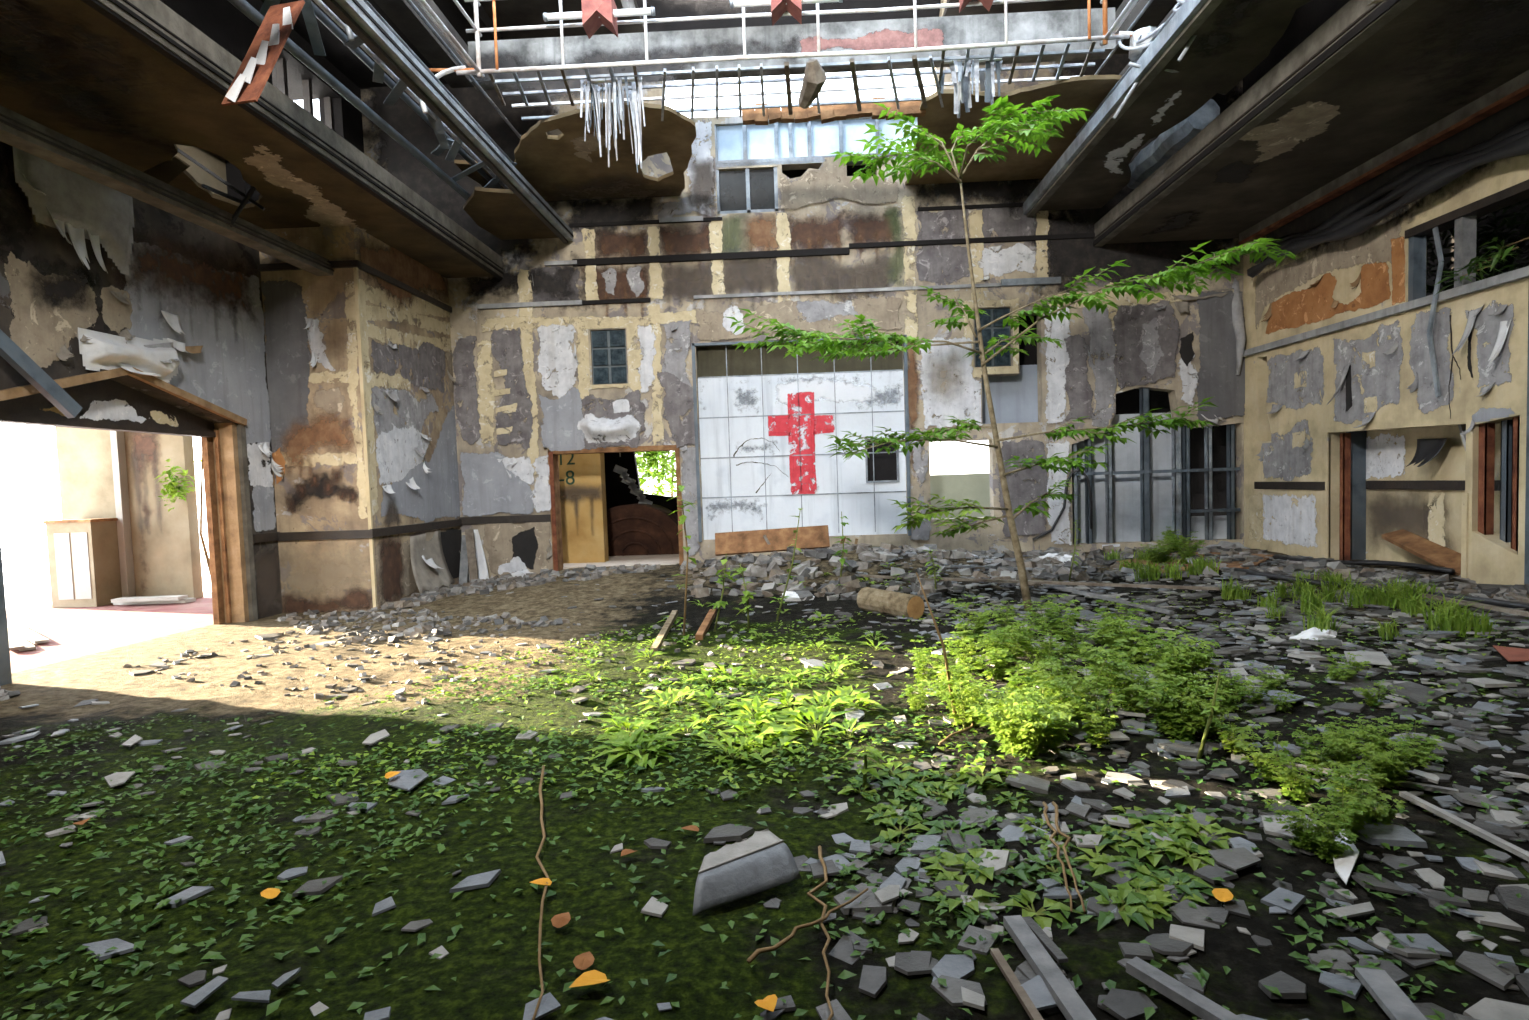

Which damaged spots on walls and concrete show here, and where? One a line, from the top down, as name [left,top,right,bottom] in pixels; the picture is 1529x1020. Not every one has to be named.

peeling [46,206,108,273]
peeling [115,329,203,377]
peeling [41,399,179,427]